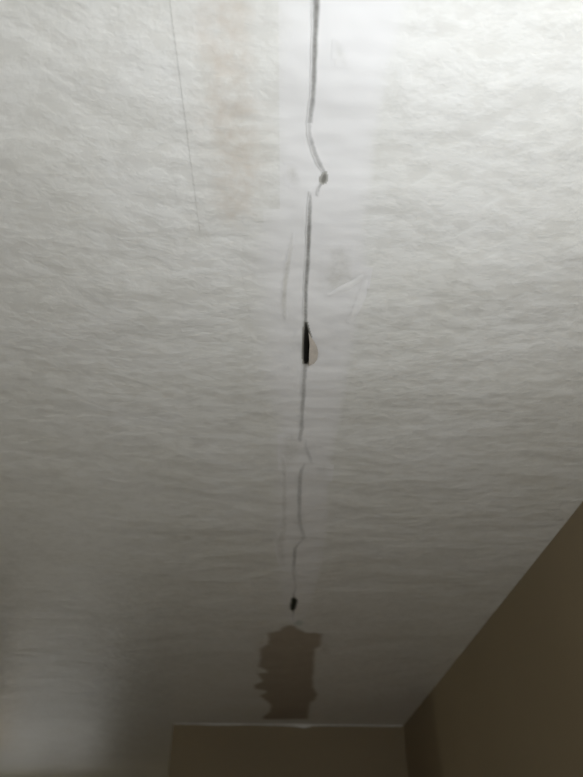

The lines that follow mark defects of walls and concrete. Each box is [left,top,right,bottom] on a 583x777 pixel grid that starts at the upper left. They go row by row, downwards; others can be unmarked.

crack [303,0,328,325]
crack [291,364,314,598]
peeling [248,597,334,720]